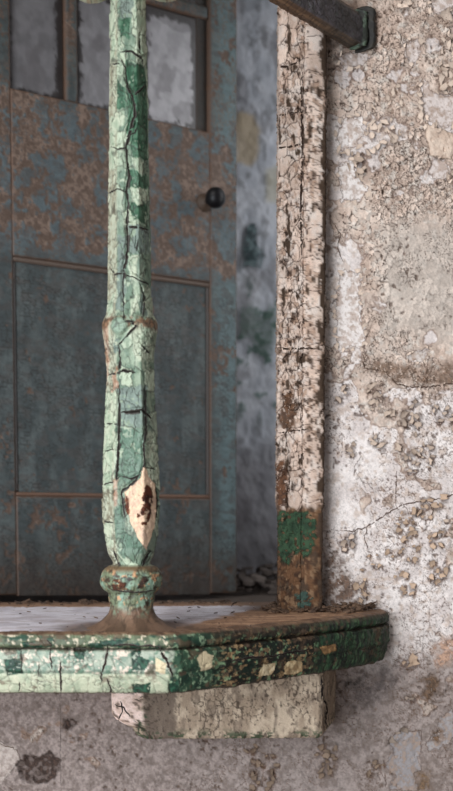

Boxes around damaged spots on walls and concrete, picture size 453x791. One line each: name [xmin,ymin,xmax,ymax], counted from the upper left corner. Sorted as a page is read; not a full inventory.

peeling [335,50,373,72]
peeling [403,37,427,67]
peeling [416,0,453,133]
crack [277,62,304,255]
peeling [334,83,403,205]
peeling [428,156,453,201]
peeling [330,268,368,353]
peeling [366,382,436,474]
peeling [433,404,453,432]
peeling [339,534,356,553]
crack [336,471,453,548]
peeling [352,494,453,604]